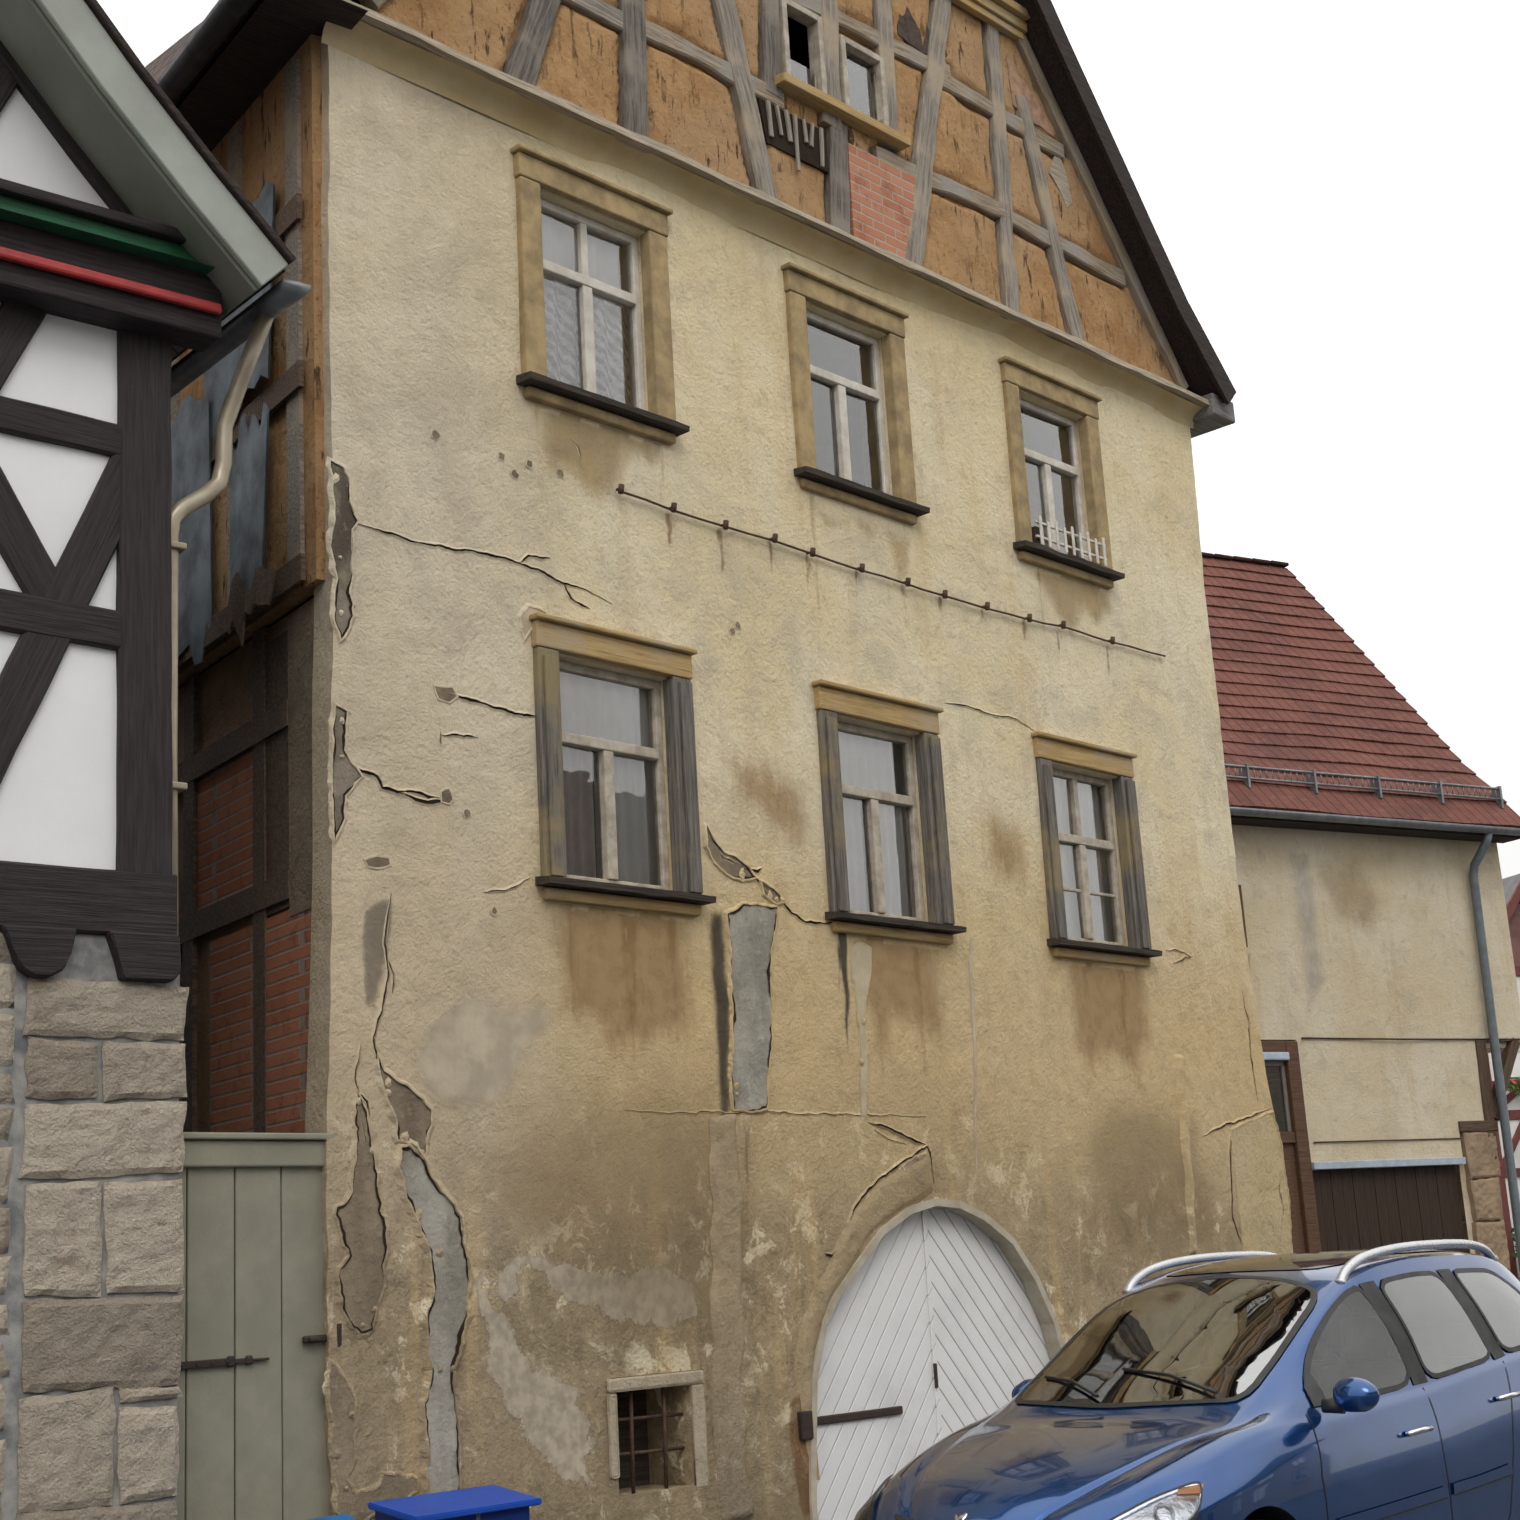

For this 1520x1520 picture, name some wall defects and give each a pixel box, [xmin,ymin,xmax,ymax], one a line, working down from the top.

flaking render [326,456,359,644]
crack [358,523,612,609]
flaking render [327,703,364,845]
crack [358,767,441,807]
damp [570,907,680,1032]
flaking render [702,822,786,1115]
flaking render [849,941,872,1117]
crack [625,1108,935,1259]
flaking render [322,1049,474,1520]